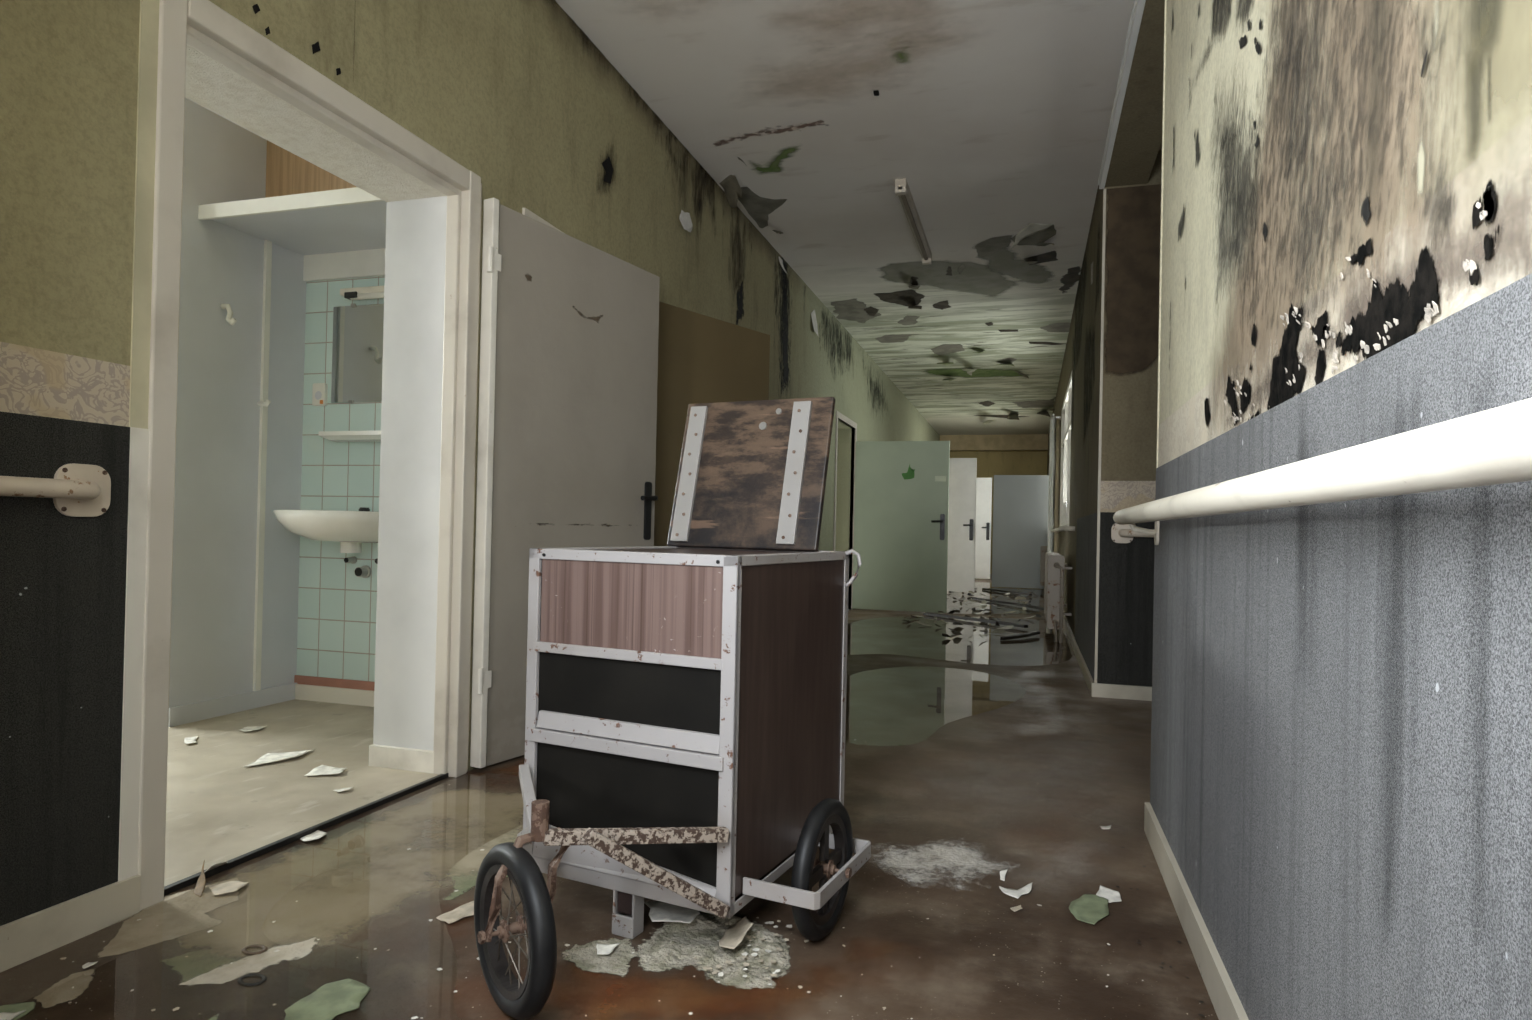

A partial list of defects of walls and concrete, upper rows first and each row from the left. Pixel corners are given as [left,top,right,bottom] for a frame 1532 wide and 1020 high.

water stain [674,148,715,215]
water stain [732,217,745,325]
peeling [719,157,787,234]
water stain [775,258,805,395]
water stain [819,311,887,419]
peeling [811,223,1093,345]
peeling [924,344,1029,381]
peeling [974,397,1056,420]
water stain [1071,184,1185,436]
spalling [1204,238,1439,428]
water stain [1191,0,1532,419]
spalling [1463,180,1499,286]